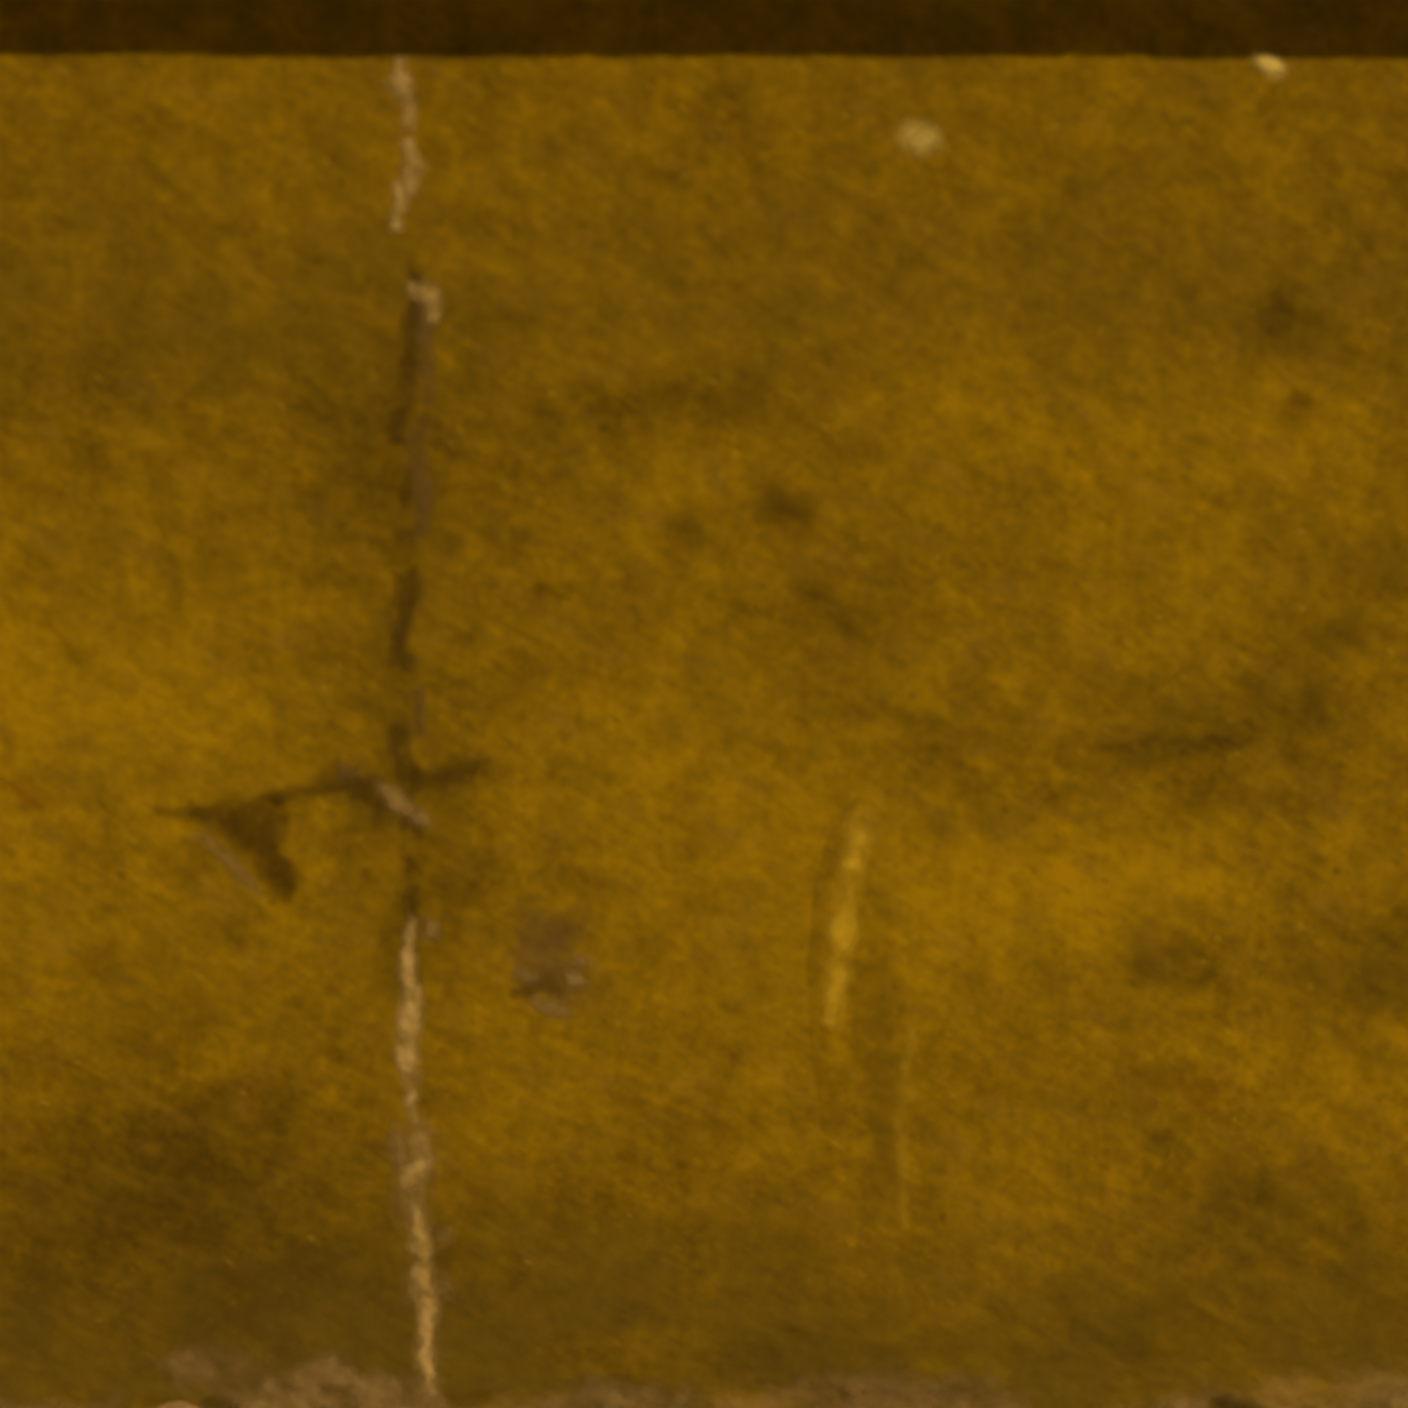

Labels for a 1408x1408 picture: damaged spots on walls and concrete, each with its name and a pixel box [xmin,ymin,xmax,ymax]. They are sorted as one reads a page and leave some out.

leakage [391,920,450,1403]